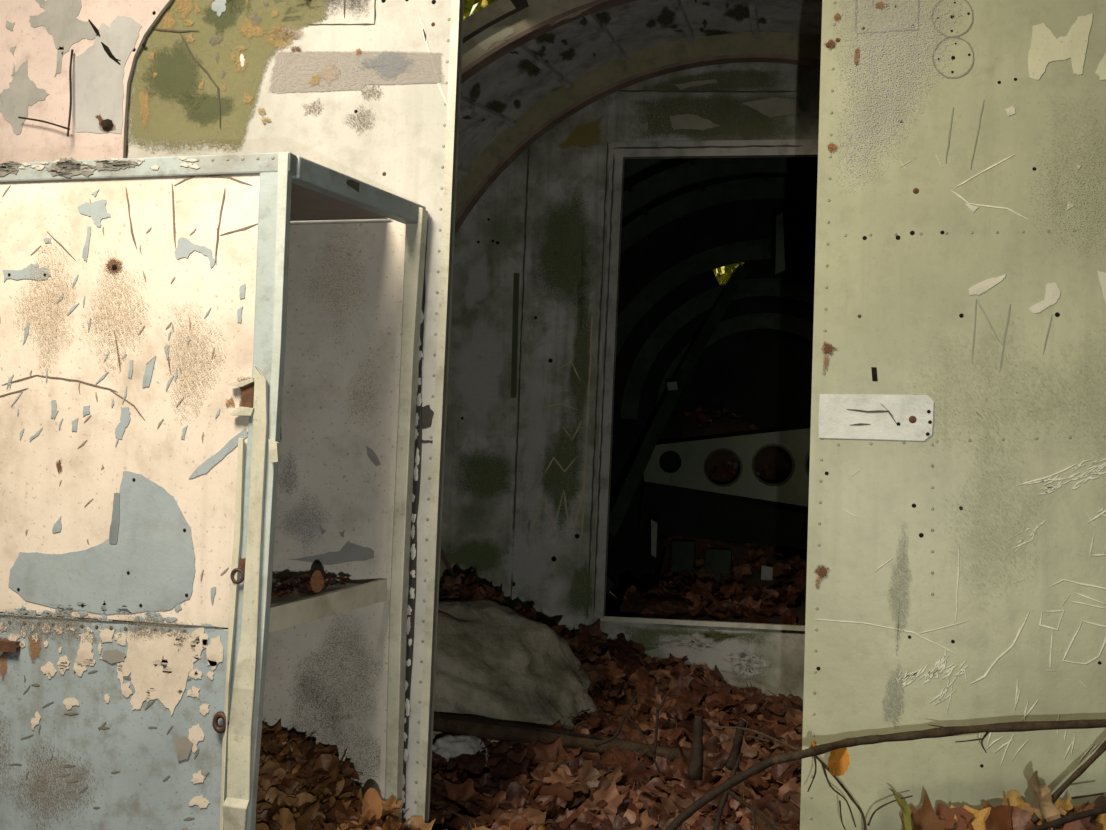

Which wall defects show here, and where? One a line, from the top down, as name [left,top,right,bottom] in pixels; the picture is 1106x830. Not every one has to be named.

peeling [0,46,49,135]
peeling [29,0,142,134]
leakage [270,0,371,40]
leakage [626,68,797,141]
peeling [1028,13,1106,80]
peeling [0,157,159,178]
peeling [78,189,111,262]
peeling [3,263,51,280]
peeling [115,407,130,439]
peeling [188,428,248,479]
peeling [0,471,224,761]
corrosion [0,632,42,681]